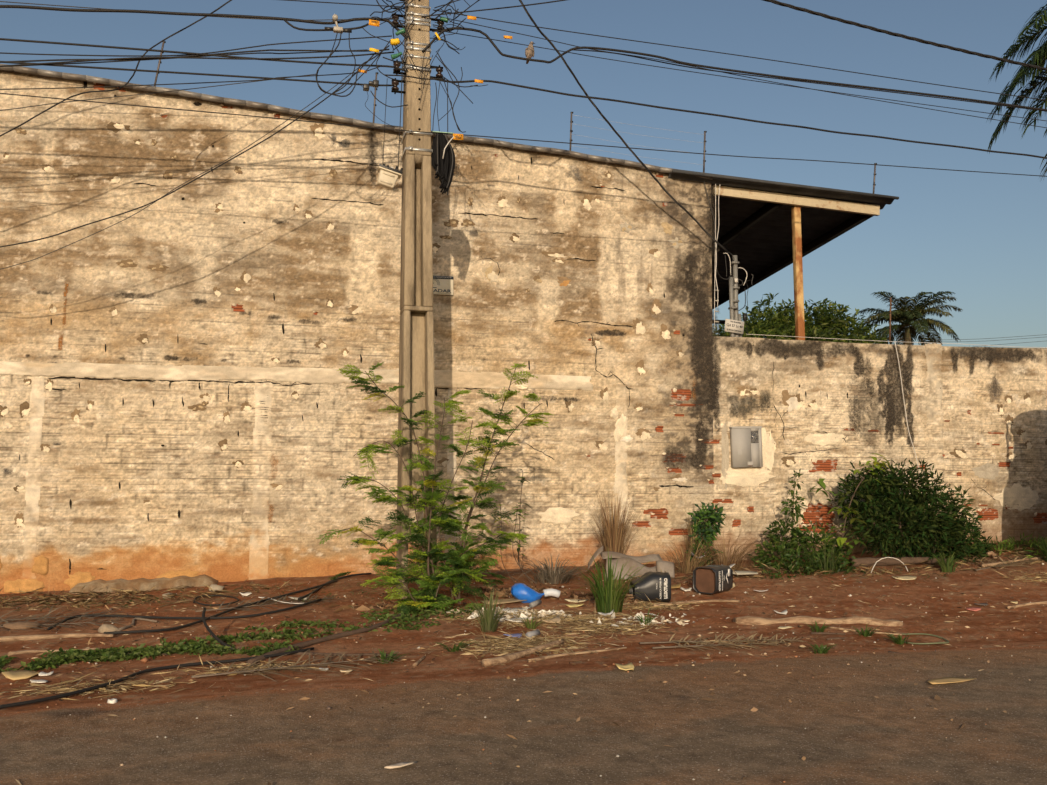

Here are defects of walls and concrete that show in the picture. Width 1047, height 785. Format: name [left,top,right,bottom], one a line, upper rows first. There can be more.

damp [663,186,914,469]
crack [554,320,633,408]
peeling [653,452,687,492]
flaking render [700,465,721,485]
peeling [771,443,796,467]
flaking render [809,458,838,472]
flaking render [630,508,693,535]
flaking render [710,498,754,528]
flaking render [799,502,842,534]